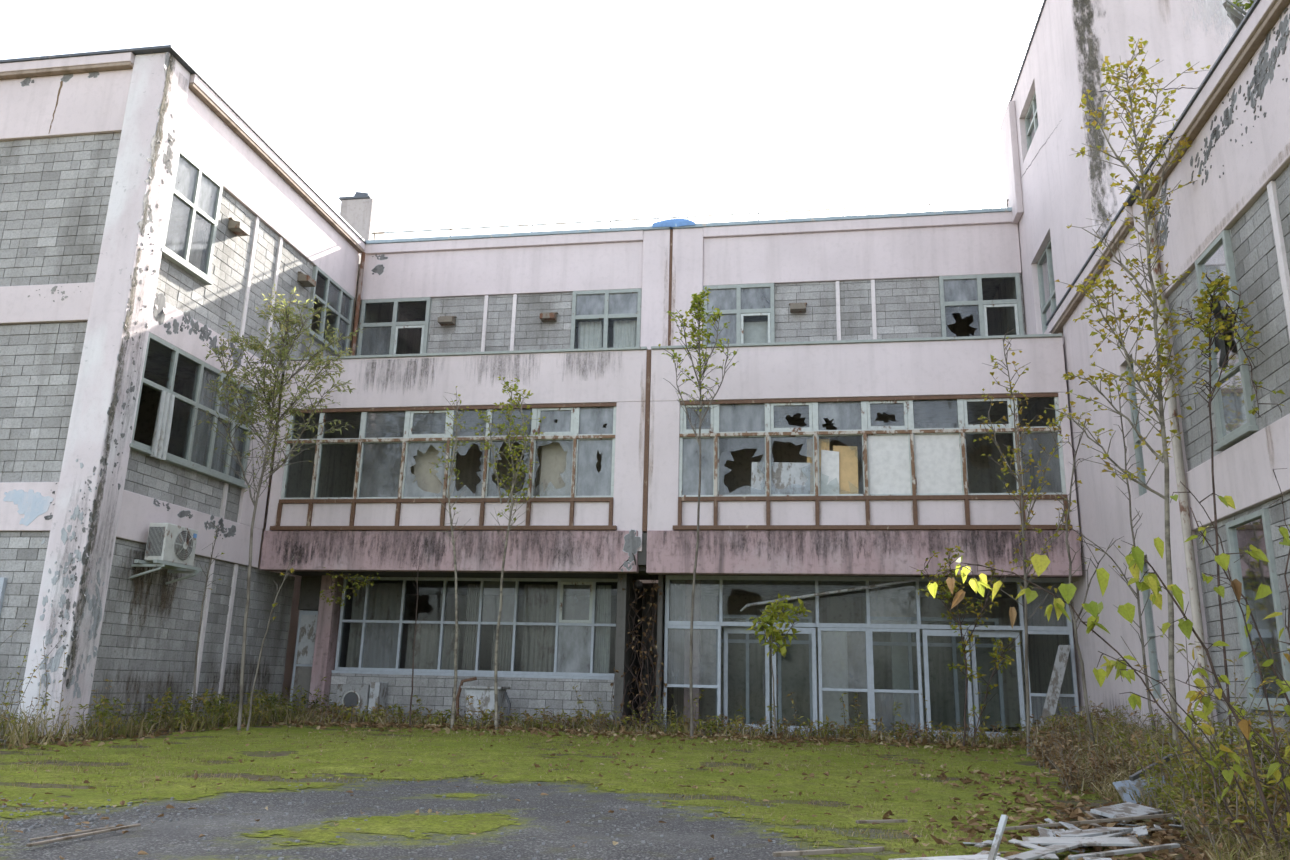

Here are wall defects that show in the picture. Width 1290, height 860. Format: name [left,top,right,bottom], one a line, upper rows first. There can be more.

crack [49,81,63,133]
water stain [1074,0,1111,235]
peeling [1189,7,1290,185]
peeling [3,52,248,710]
water stain [122,549,182,635]